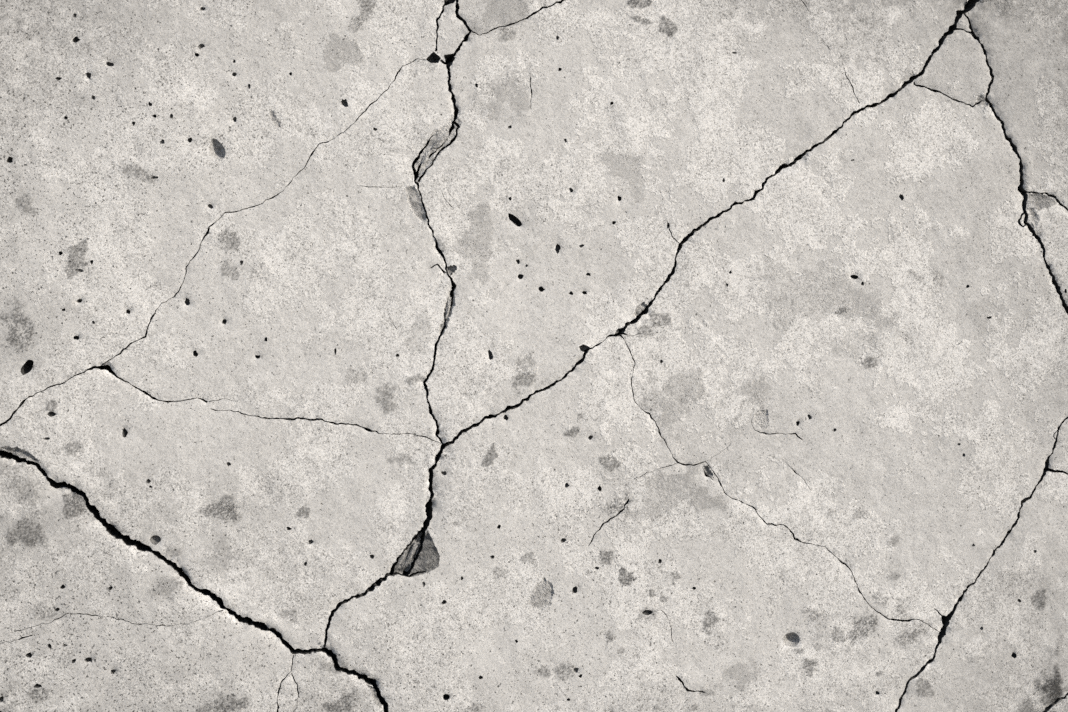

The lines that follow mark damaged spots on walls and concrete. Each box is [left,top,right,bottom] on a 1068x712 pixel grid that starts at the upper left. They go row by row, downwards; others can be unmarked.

crack [0,450,388,712]
crack [0,59,424,426]
crack [212,409,392,435]
spalling [394,527,440,587]
crack [323,0,1068,647]
crack [631,375,947,712]
crack [1043,693,1068,712]